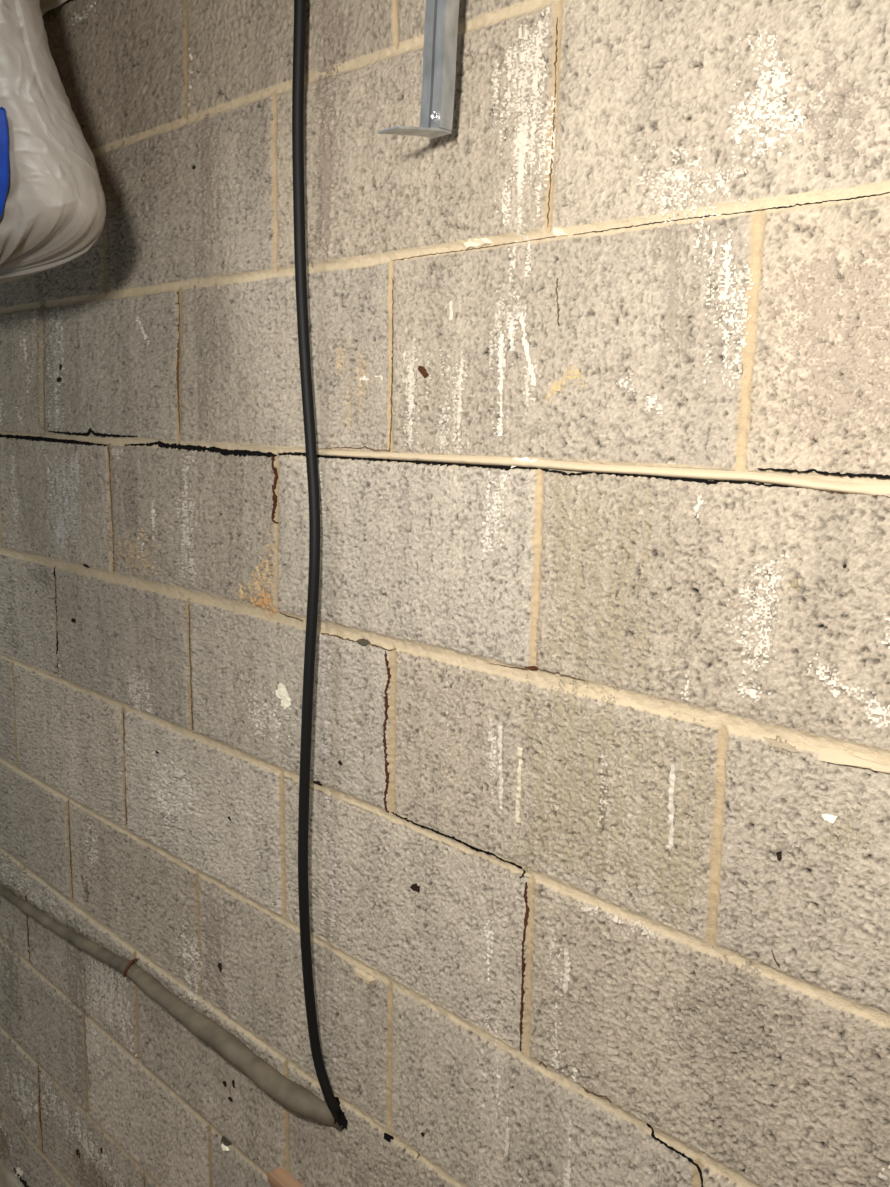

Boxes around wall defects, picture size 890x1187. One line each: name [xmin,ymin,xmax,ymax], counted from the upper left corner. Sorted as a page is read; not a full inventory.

crack [0,18,890,571]
crack [490,663,585,681]
crack [279,612,547,1067]
crack [582,1087,612,1103]
crack [646,1123,703,1187]